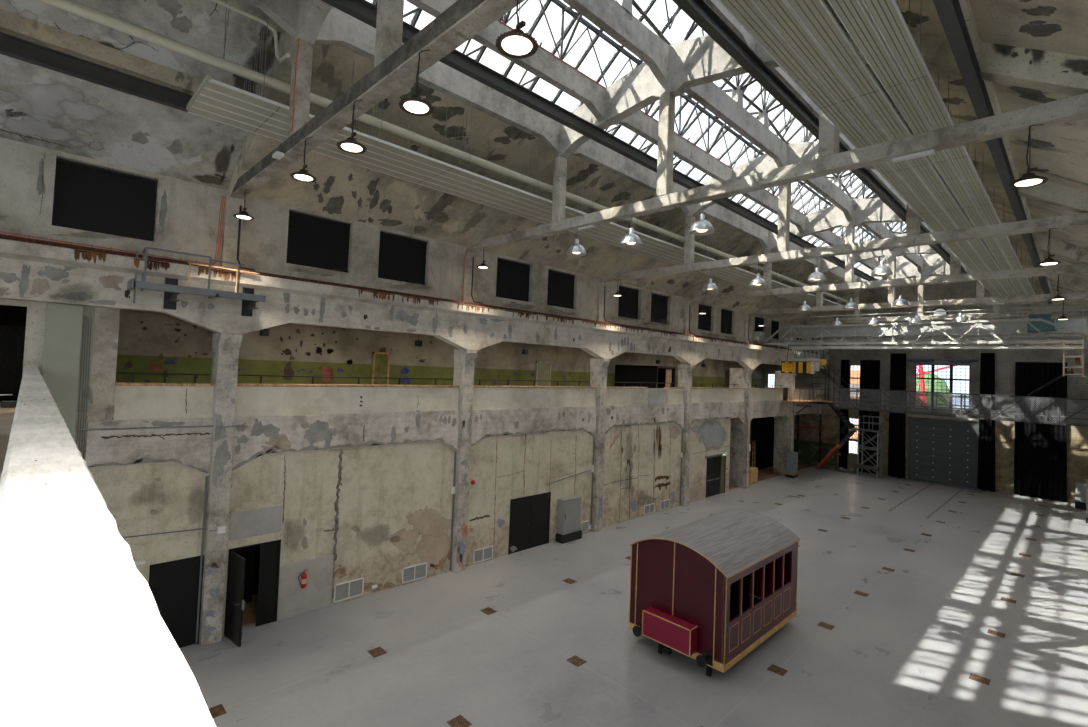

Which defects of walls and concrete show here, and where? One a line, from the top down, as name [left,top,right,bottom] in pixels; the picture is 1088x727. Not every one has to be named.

leakage [994,44,1045,64]
leakage [1062,60,1088,76]
peeling [315,178,353,214]
corrosion [73,249,106,263]
corrosion [133,258,170,271]
corrosion [198,267,246,281]
flaking render [388,506,467,570]